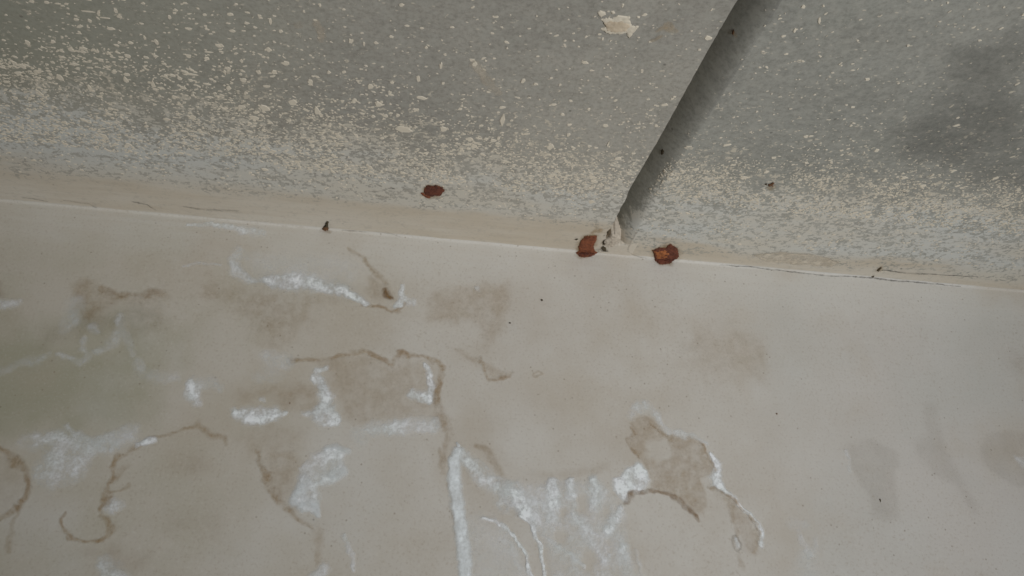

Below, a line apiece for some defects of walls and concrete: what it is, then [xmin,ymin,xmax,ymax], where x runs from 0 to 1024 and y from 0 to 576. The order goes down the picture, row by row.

peeling [0,0,676,219]
corrosion [421,185,445,198]
corrosion [576,235,598,258]
corrosion [652,244,679,265]
damp [230,260,368,306]
damp [185,379,201,405]
damp [232,408,288,425]
damp [304,366,341,426]
damp [408,363,434,404]
damp [291,447,347,517]
damp [448,442,649,576]
damp [709,452,764,547]